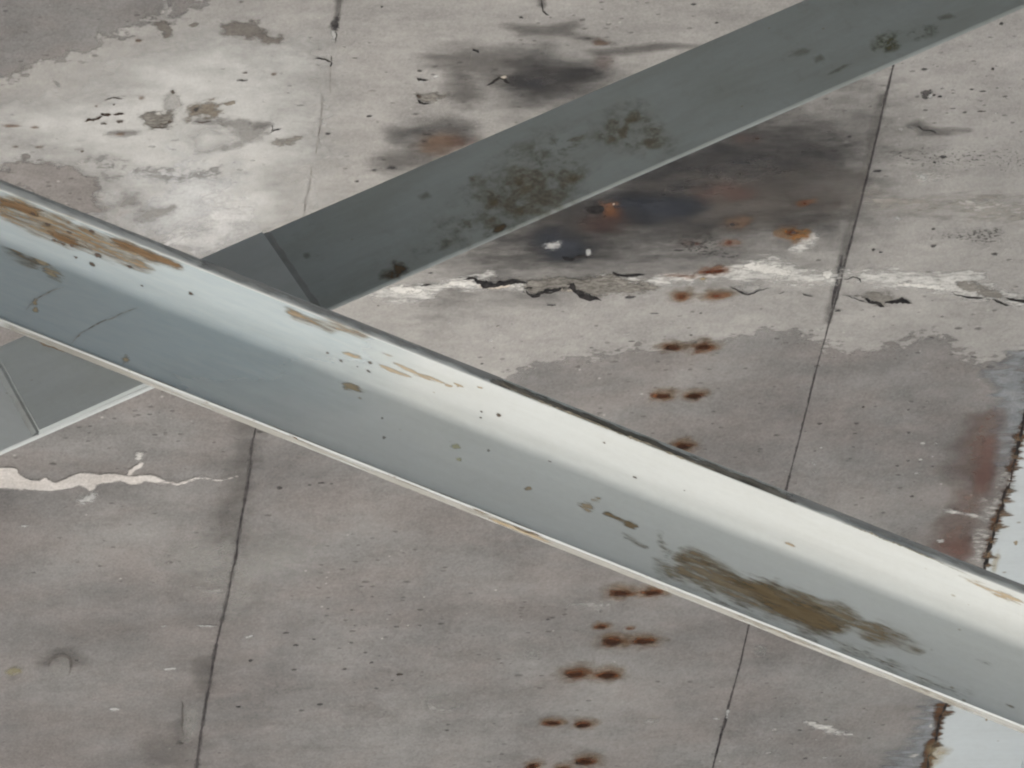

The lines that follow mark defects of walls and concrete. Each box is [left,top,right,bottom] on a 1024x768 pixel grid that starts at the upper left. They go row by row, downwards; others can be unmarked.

damp [0,0,804,259]
damp [332,8,1024,479]
crack [844,276,912,307]
crack [953,281,1024,306]
rust [660,339,717,353]
rust [651,390,709,401]
rust [982,413,1024,570]
damp [973,495,1002,562]
rust [610,587,669,596]
rust [594,624,656,647]
rust [565,666,622,680]
rust [906,677,954,768]